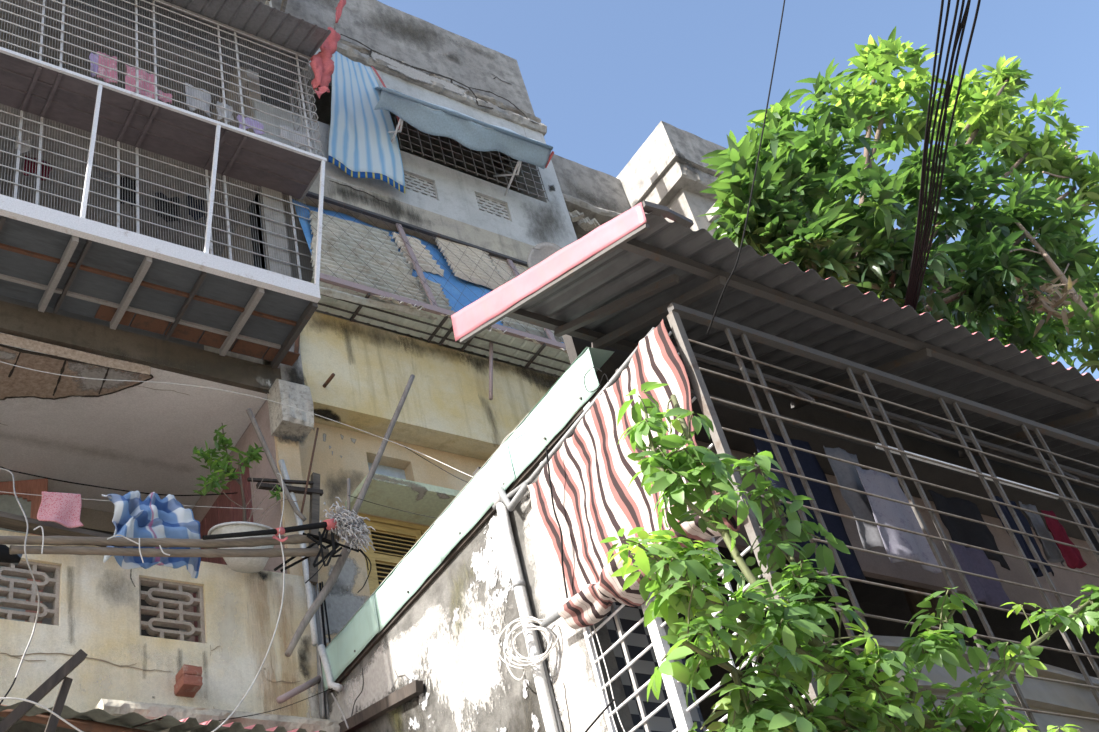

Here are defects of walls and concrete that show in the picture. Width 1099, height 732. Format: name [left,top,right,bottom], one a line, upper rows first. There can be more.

water stain [375,17,437,41]
spalling [0,333,153,400]
peeling [400,516,513,731]
water stain [299,639,308,678]